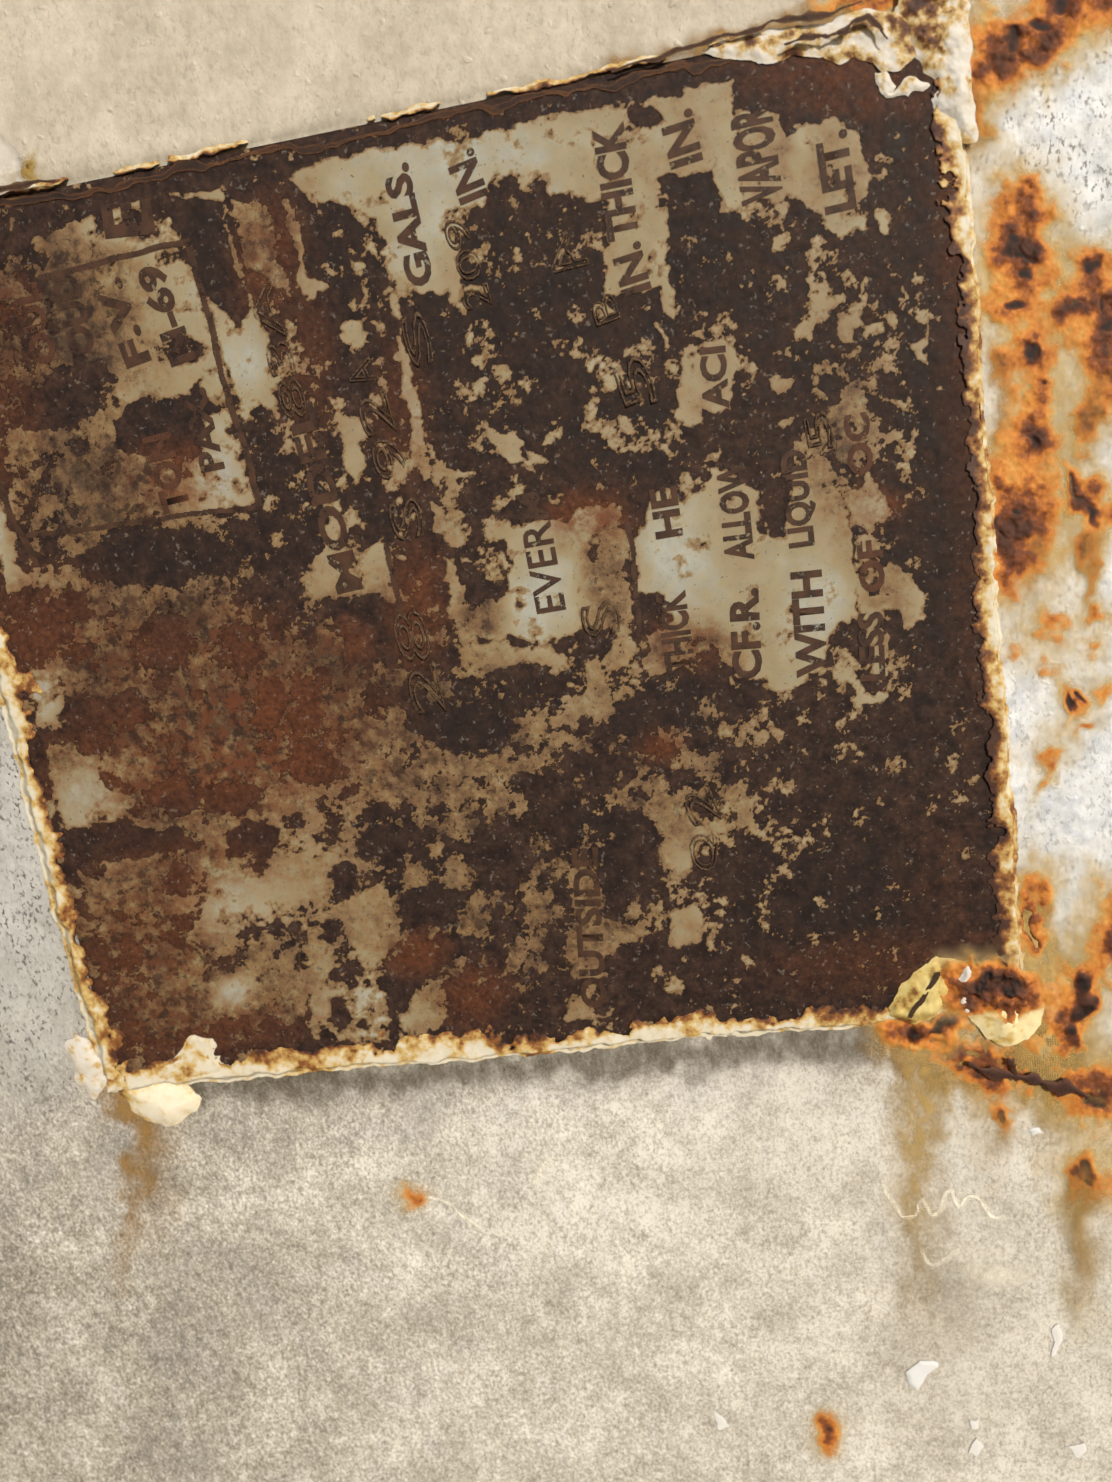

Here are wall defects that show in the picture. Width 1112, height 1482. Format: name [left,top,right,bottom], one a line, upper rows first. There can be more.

corrosion [0,0,899,206]
corrosion [969,0,1112,142]
corrosion [979,170,1112,730]
corrosion [1036,746,1063,789]
corrosion [874,871,1112,1255]
crack [967,1057,1089,1100]
corrosion [814,1412,842,1457]